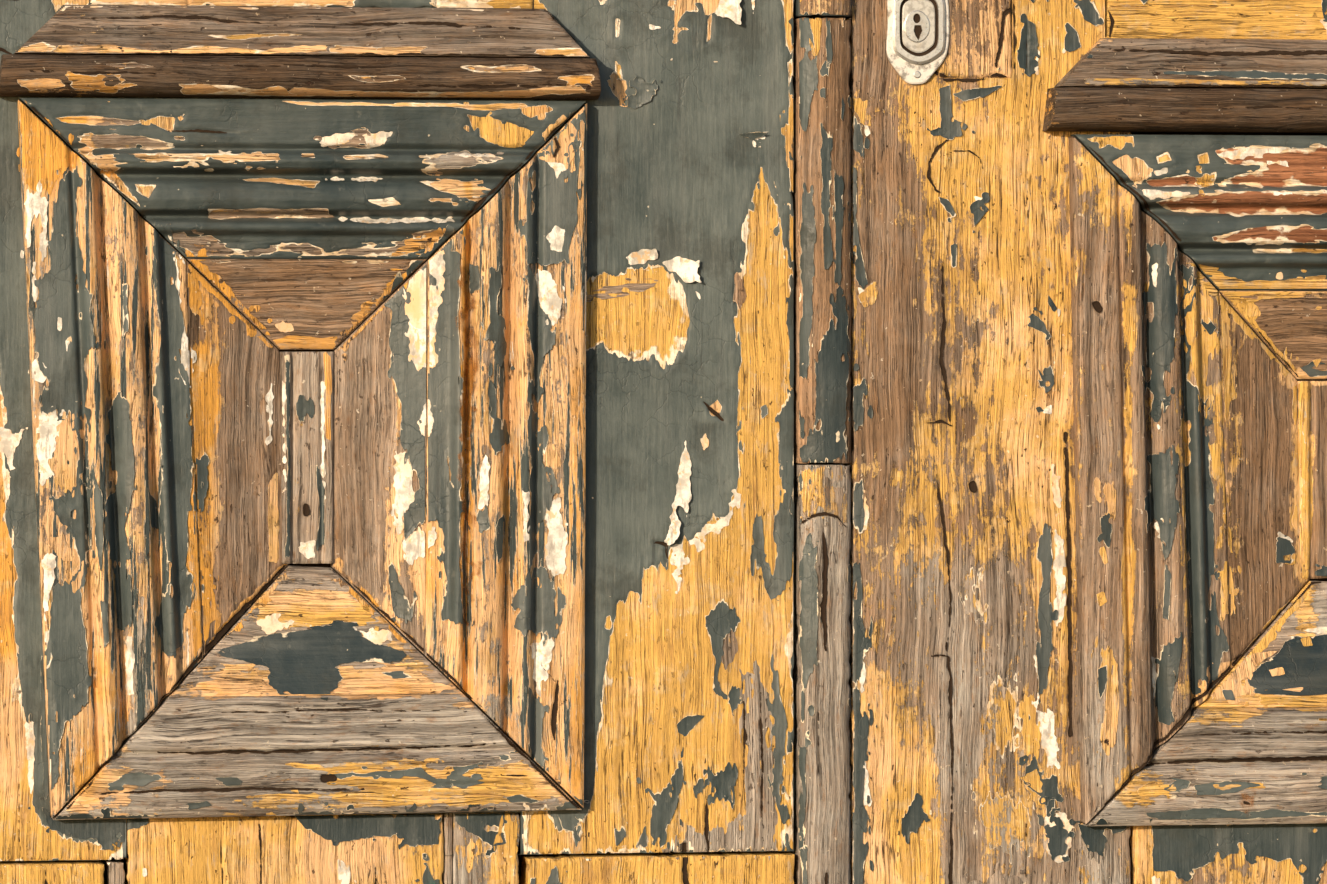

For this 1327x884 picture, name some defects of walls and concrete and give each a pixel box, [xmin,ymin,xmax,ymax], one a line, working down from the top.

peeling [1017,0,1049,77]
peeling [1062,0,1104,58]
peeling [927,68,1002,142]
peeling [938,192,990,233]
peeling [1088,136,1327,253]
peeling [1027,295,1060,340]
peeling [0,0,885,884]
peeling [1093,477,1116,564]
peeling [1141,241,1327,725]
peeling [970,523,1127,884]
peeling [897,793,932,844]
peeling [1138,778,1327,884]